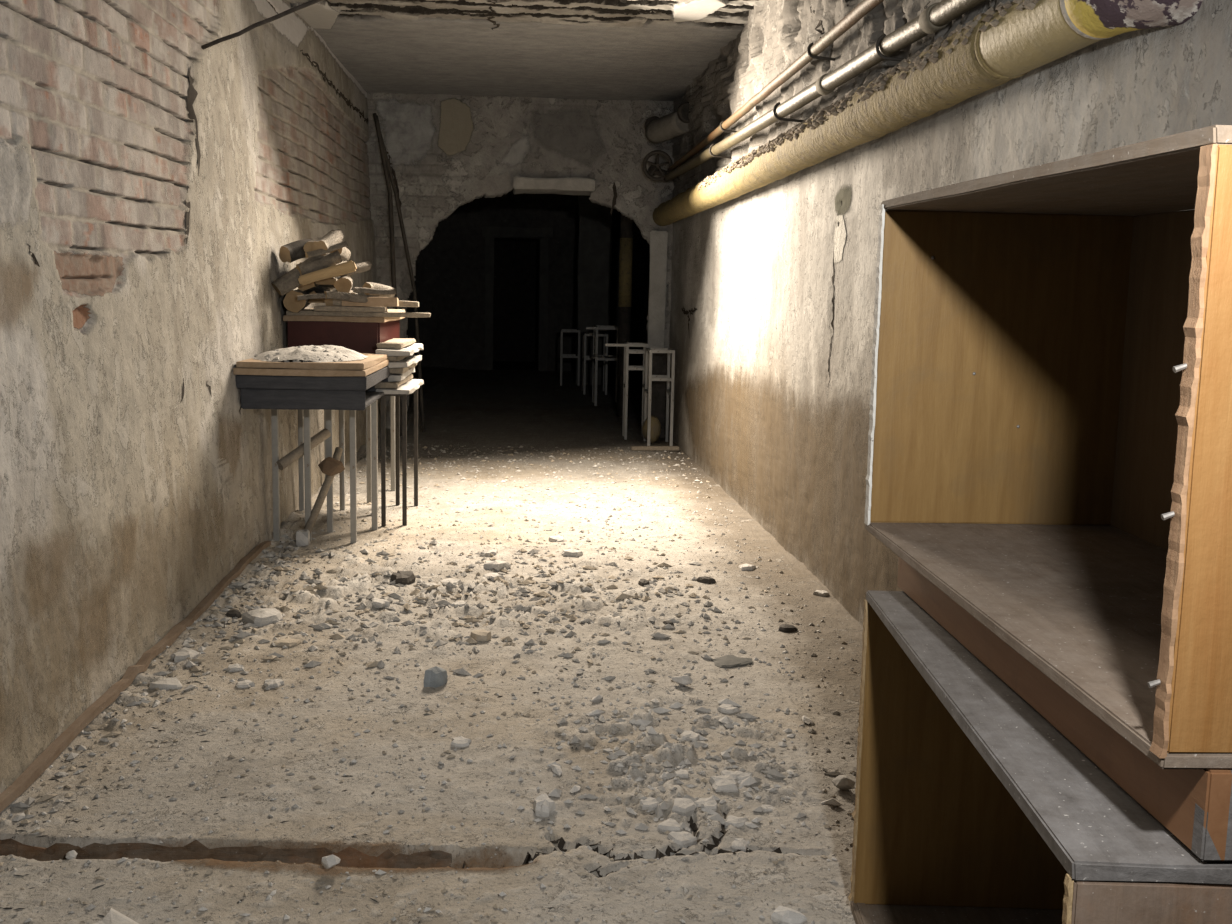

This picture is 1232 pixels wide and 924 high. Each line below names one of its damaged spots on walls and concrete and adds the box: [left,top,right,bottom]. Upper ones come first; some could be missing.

crack [484,0,500,30]
crack [810,6,824,38]
peeling [0,145,32,225]
spalling [54,251,124,329]
rust [167,842,533,874]
crack [503,812,800,878]